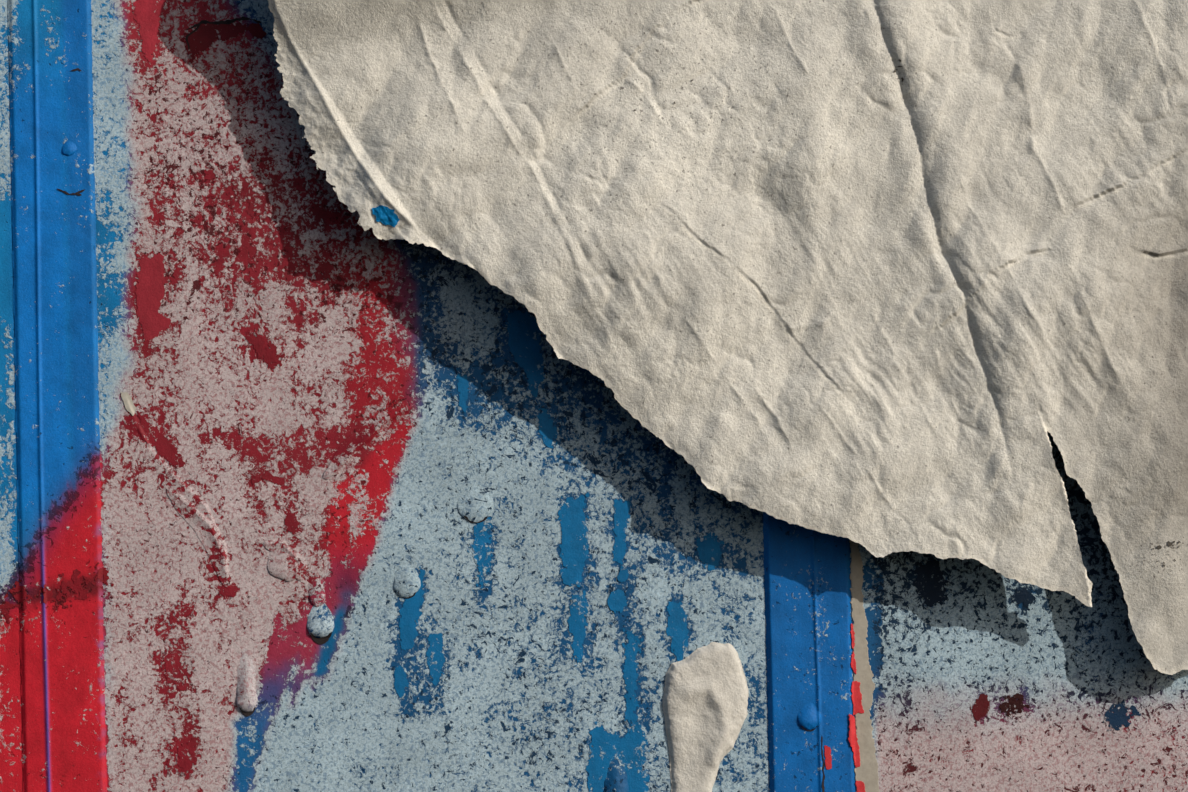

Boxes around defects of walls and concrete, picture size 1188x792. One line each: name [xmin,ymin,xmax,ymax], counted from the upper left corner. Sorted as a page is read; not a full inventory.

peeling [215,143,346,292]
peeling [245,330,285,369]
peeling [503,308,558,449]
peeling [284,512,299,535]
peeling [398,566,446,686]
peeling [467,517,493,591]
peeling [558,492,589,667]
peeling [607,499,631,614]
peeling [666,601,689,661]
peeling [913,560,949,609]
peeling [1011,586,1036,610]
peeling [586,628,650,792]